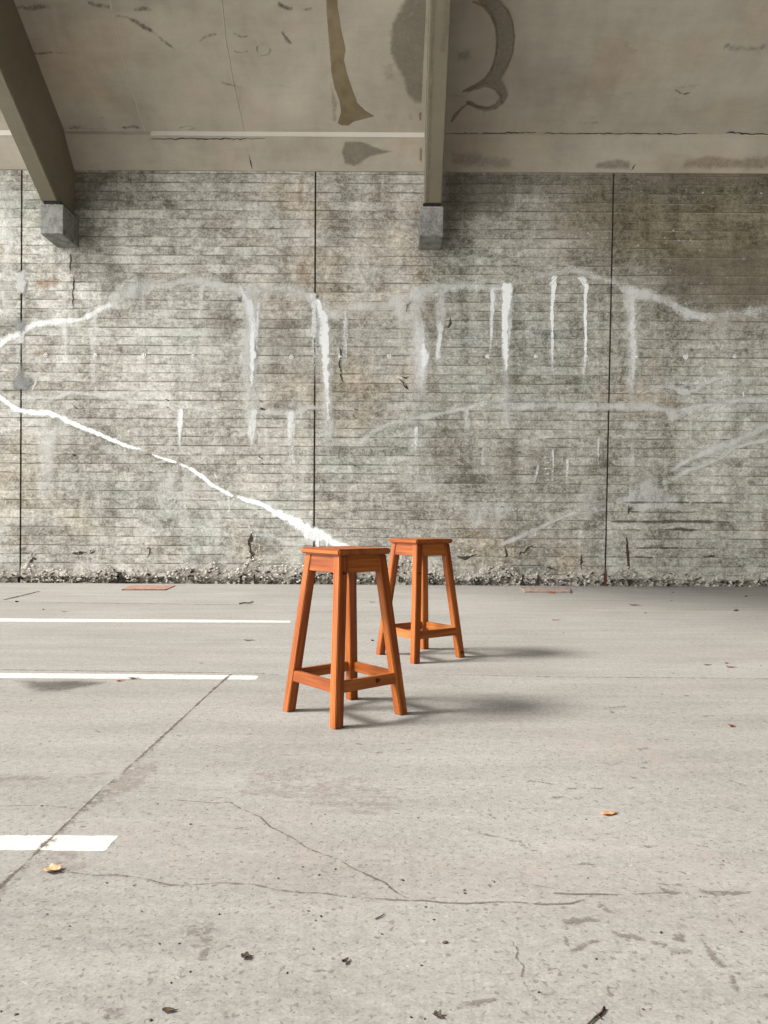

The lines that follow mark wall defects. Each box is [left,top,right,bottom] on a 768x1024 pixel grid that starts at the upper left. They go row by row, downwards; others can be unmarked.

water stain [327,0,373,125]
water stain [392,0,435,167]
water stain [451,0,515,122]
water stain [343,142,382,165]
water stain [0,267,766,463]
crack [245,530,262,563]
crack [179,800,666,905]